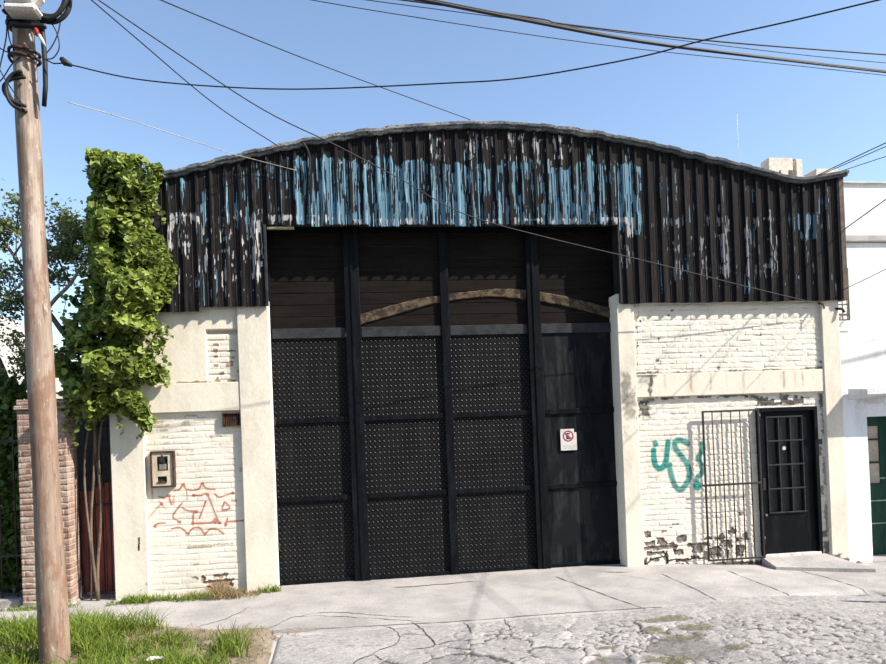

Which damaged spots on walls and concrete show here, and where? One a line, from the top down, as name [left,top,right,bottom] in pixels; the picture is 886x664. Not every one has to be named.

peeling [161,131,652,306]
peeling [660,186,829,294]
peeling [213,343,239,379]
peeling [766,394,823,407]
spalling [644,523,750,565]
crack [269,612,886,664]